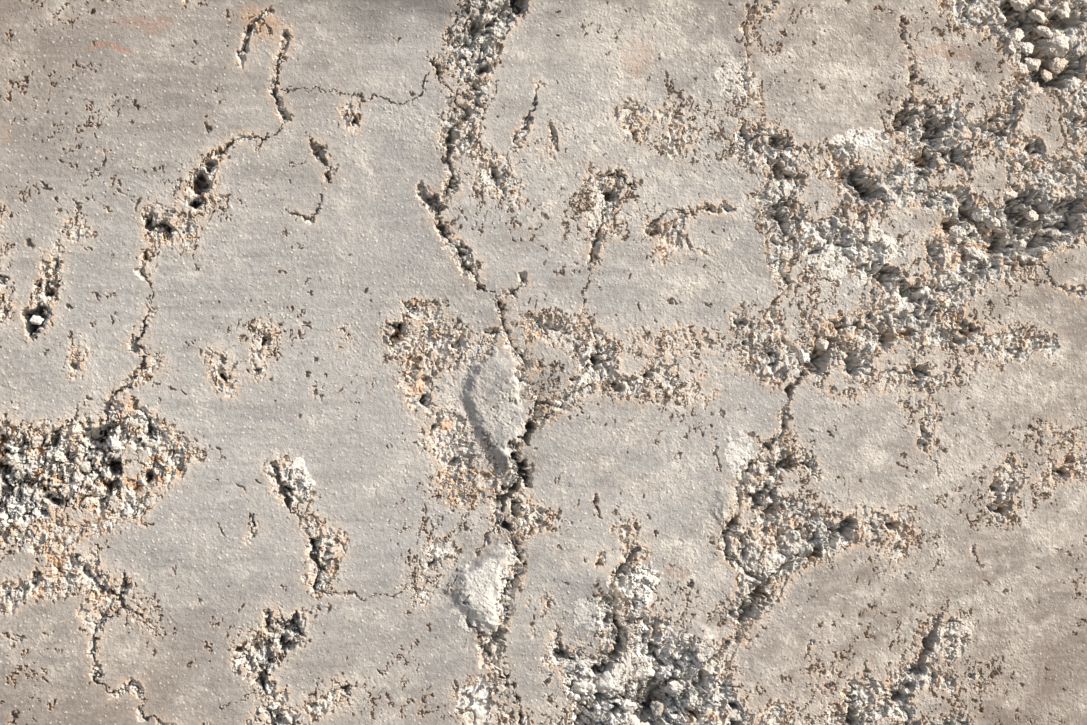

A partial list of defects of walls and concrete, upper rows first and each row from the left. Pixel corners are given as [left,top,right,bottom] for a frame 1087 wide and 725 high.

spalling [0,199,93,341]
crack [85,156,109,183]
crack [202,7,642,725]
spalling [382,298,510,510]
crack [645,0,818,696]
spalling [729,0,1087,409]
spalling [0,397,207,631]
spalling [420,538,460,574]
spalling [506,494,555,537]
crack [82,564,174,725]
spalling [542,575,795,725]
spalling [826,622,995,725]